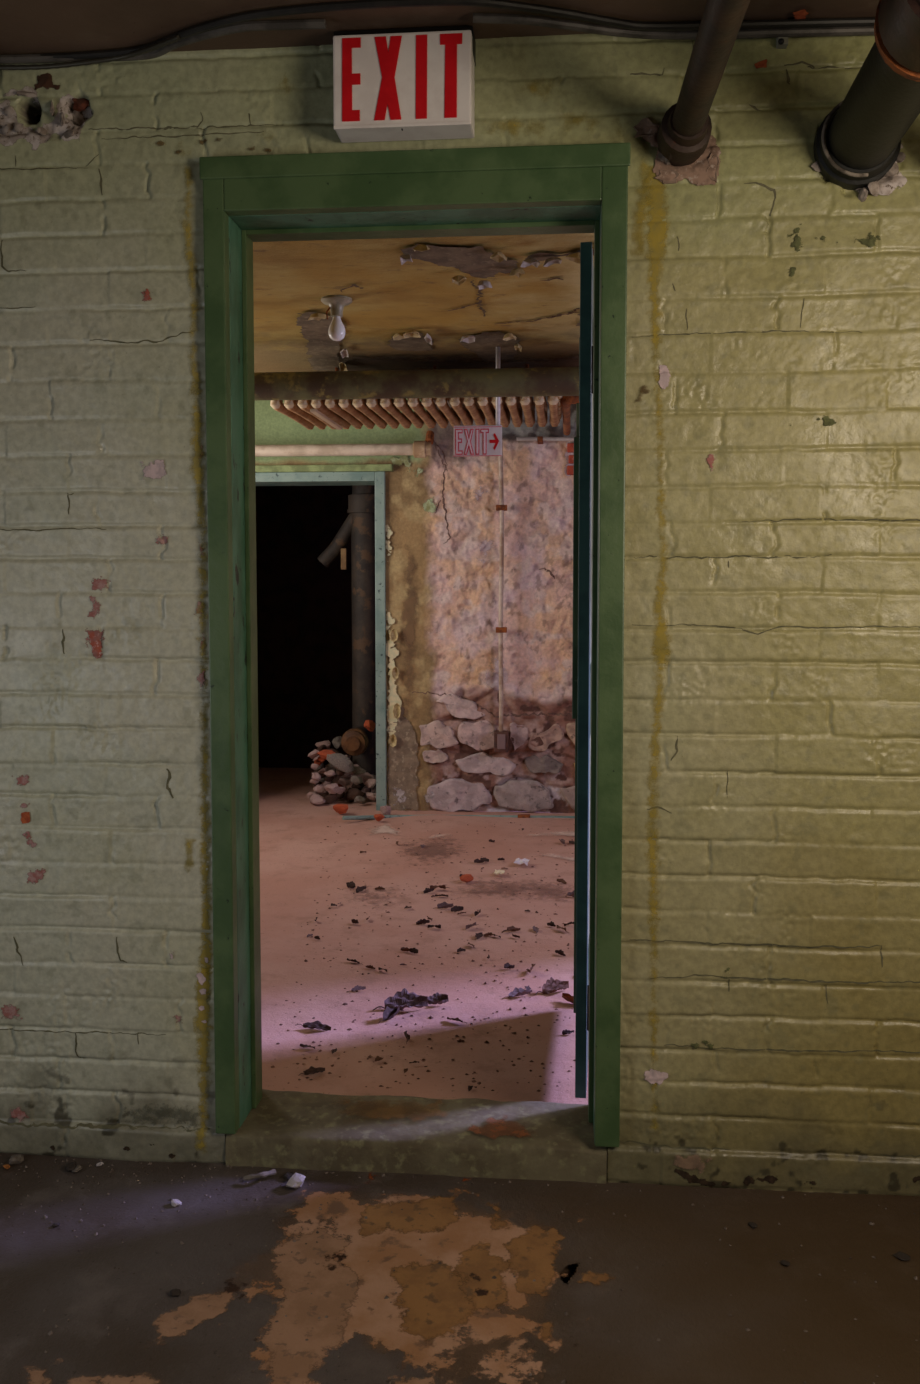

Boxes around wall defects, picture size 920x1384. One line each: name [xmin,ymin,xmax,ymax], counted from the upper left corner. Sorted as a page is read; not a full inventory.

spalling [0,86,92,151]
flaking render [633,118,721,186]
flaking render [856,143,907,202]
peeling [400,244,594,290]
damp [184,168,207,685]
peeling [86,576,111,659]
damp [124,706,213,1150]
peeling [153,1188,615,1384]